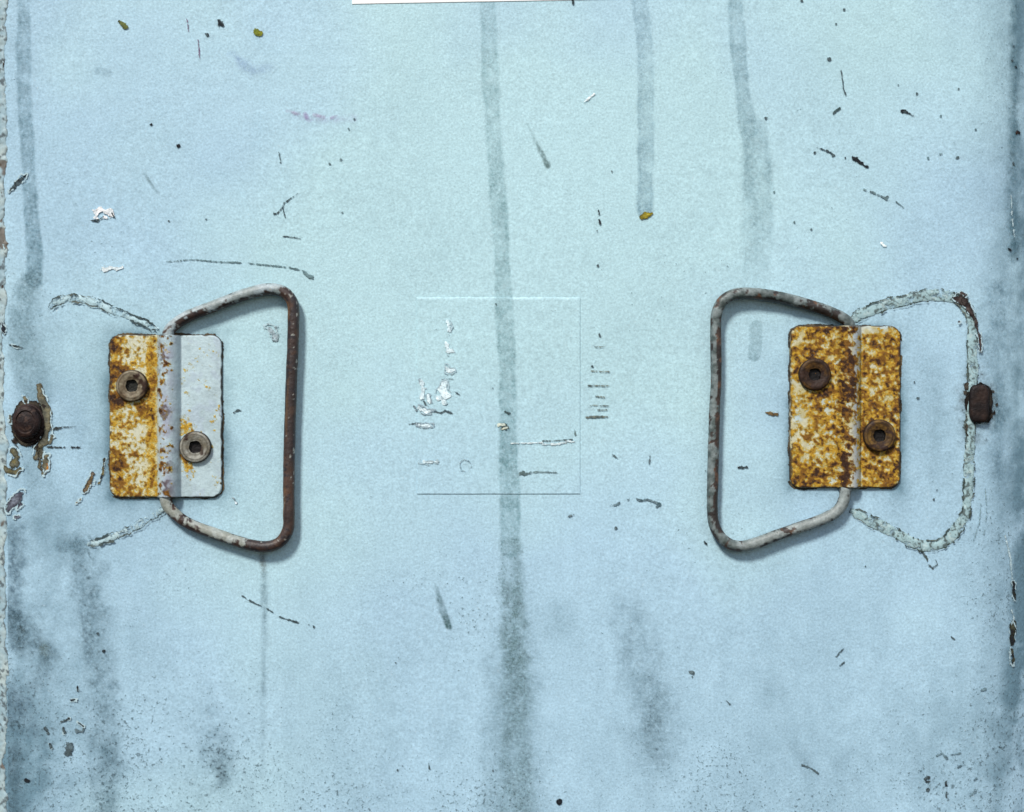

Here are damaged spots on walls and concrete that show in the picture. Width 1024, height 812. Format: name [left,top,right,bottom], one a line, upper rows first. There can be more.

spalling [952,291,983,353]
peeling [3,383,55,520]
peeling [75,458,107,505]
rust [110,335,222,497]
rust [765,326,900,488]
peeling [963,379,998,436]